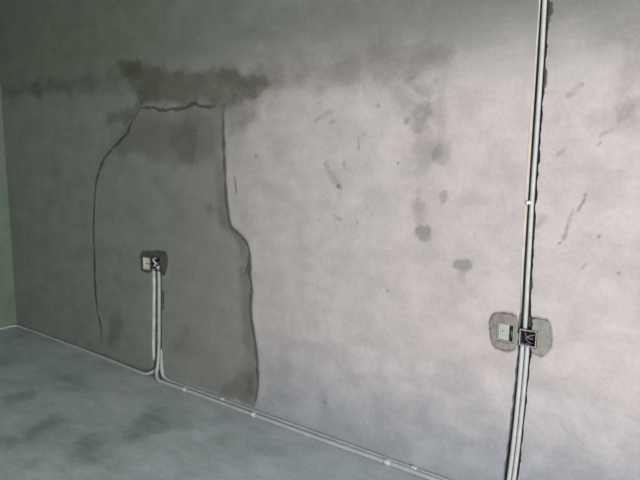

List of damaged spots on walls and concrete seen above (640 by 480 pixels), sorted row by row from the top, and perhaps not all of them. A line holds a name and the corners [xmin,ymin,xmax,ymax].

crack [93,96,266,411]